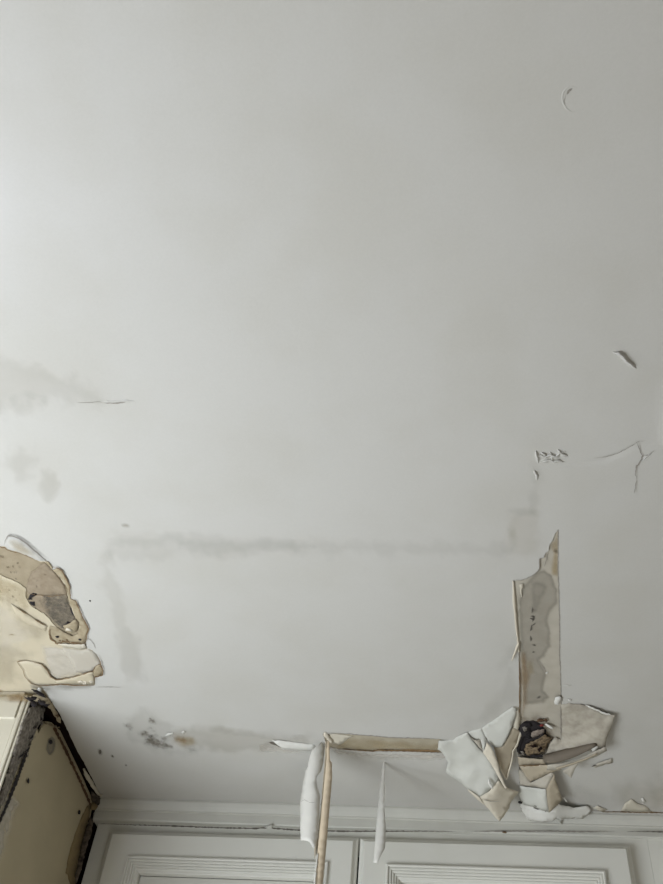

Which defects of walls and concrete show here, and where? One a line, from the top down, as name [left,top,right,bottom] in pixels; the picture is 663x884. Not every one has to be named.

flaking render [0,536,103,723]